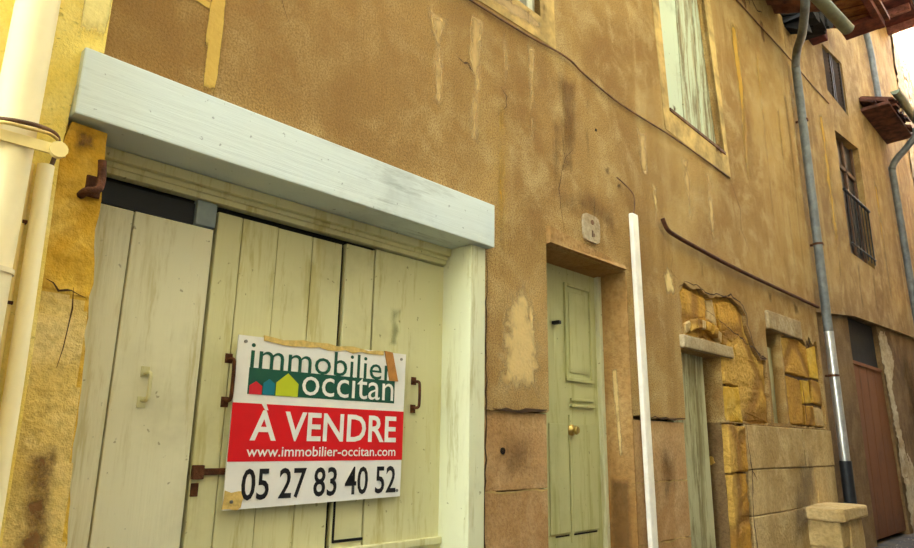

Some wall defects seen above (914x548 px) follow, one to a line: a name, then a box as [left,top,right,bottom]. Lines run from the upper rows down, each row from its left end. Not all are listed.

crack [47,279,86,368]
flaking render [501,290,539,388]
spalling [679,281,768,548]
spalling [781,336,824,430]
flaking render [878,331,914,533]